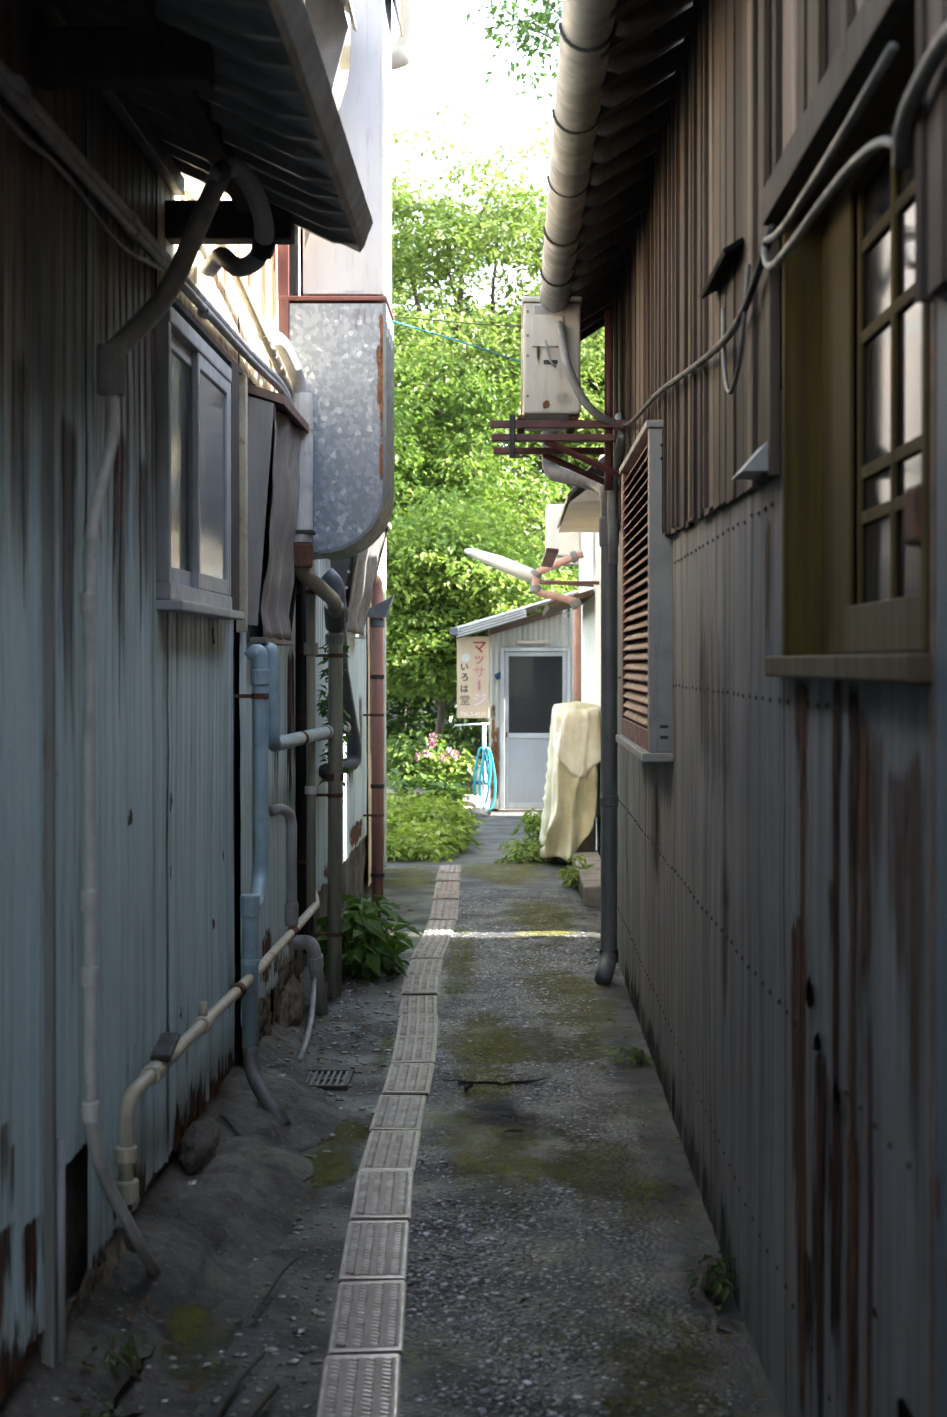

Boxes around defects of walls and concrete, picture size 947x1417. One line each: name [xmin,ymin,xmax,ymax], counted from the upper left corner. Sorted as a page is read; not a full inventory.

corrosion [0,1214,43,1405]